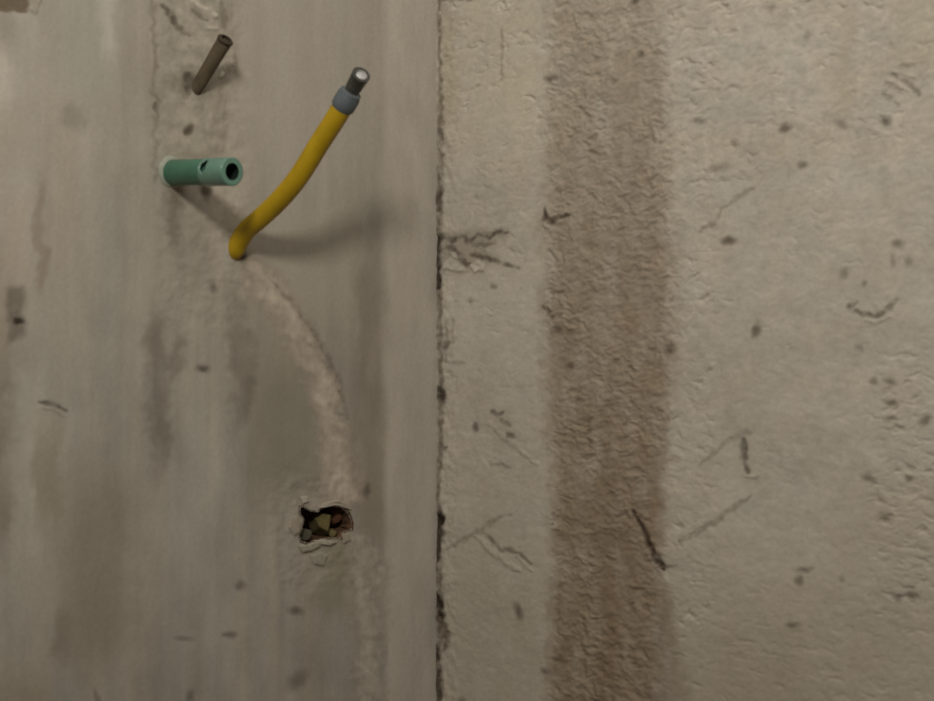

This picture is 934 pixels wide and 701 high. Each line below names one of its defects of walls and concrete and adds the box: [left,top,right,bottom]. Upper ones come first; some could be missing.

peeling [0,0,41,13]
spalling [288,496,354,566]
crack [632,510,664,566]